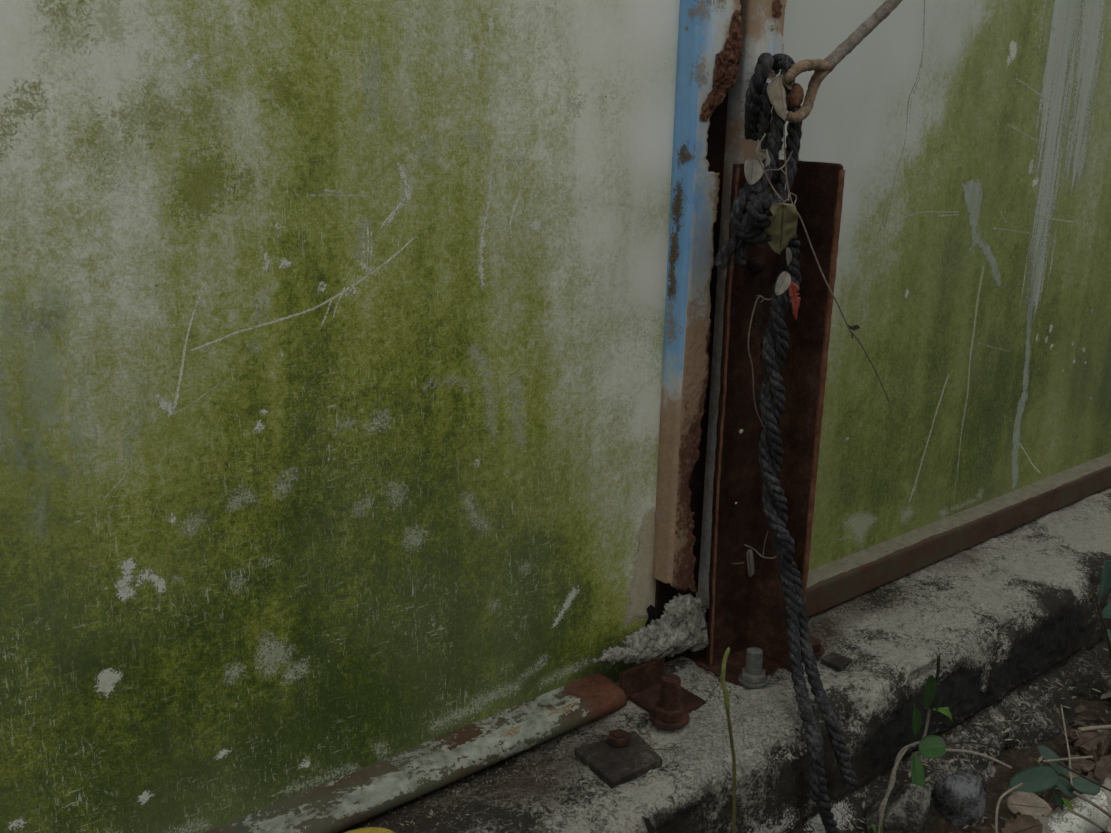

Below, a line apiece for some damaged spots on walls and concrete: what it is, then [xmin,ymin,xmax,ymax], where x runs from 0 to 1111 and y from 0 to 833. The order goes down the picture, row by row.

rust [688,0,743,121]
rust [770,0,782,35]
rust [676,141,696,167]
rust [666,181,687,344]
water stain [1011,0,1108,489]
water stain [624,509,656,625]
peeling [138,790,155,805]
peeling [283,759,359,796]
peeling [429,682,523,734]
water stain [657,684,807,793]
water stain [748,797,857,833]
water stain [863,599,1086,767]